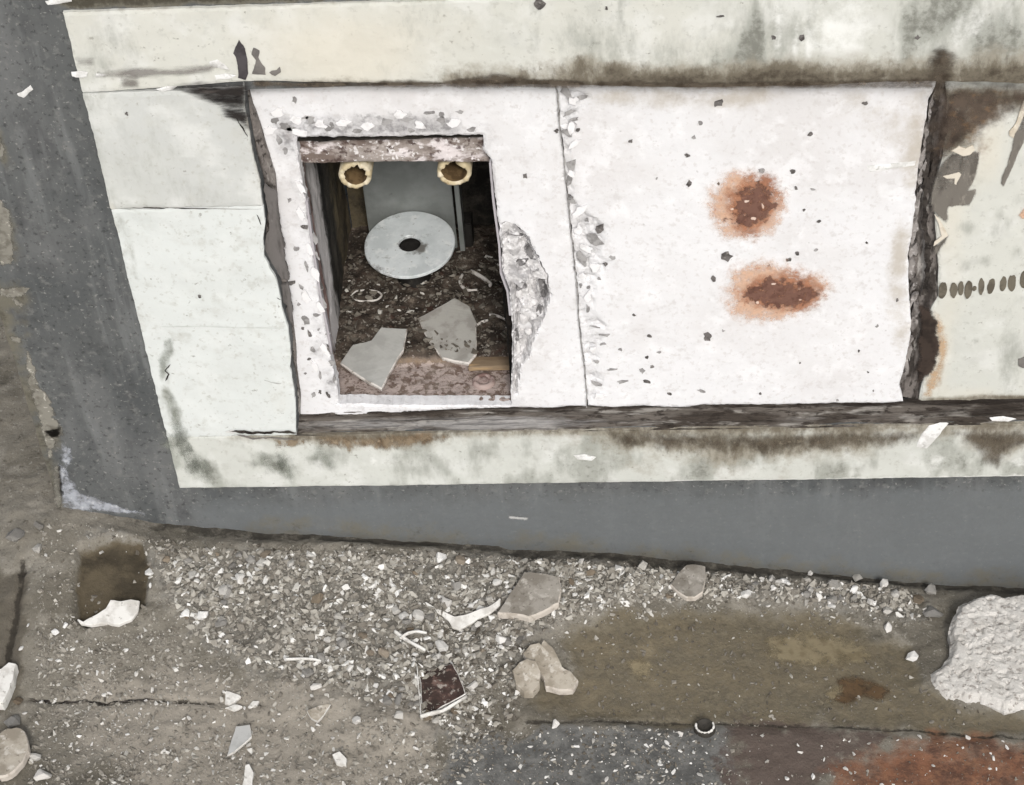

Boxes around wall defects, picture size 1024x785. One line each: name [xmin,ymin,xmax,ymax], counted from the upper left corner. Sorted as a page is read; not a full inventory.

spalling [215,41,281,80]
spalling [1001,117,1024,186]
crack [132,50,953,408]
corrosion [712,173,784,236]
peeling [931,145,979,254]
spalling [502,221,550,394]
corrosion [728,265,827,320]
crack [226,279,301,440]
damp [622,434,913,453]
damp [966,434,1024,466]